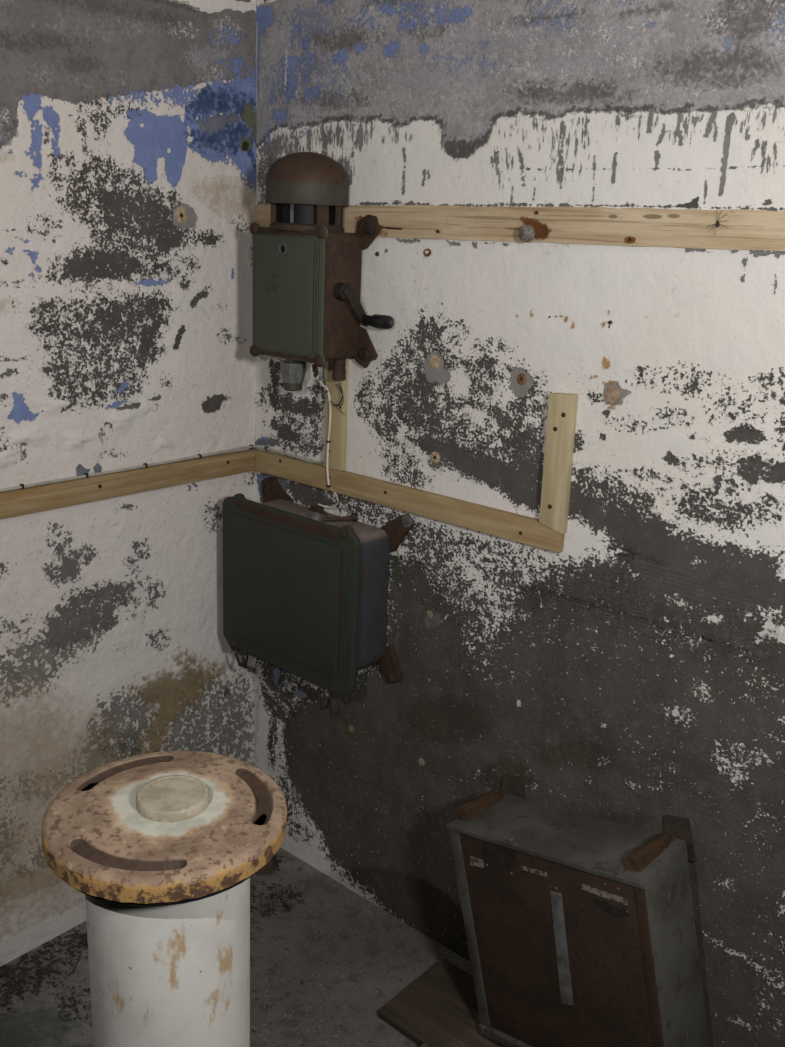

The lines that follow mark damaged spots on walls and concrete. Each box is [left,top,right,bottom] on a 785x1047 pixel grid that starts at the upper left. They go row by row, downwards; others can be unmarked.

water stain [511,149,536,204]
water stain [558,122,566,189]
water stain [647,109,683,171]
water stain [703,110,735,204]
spalling [0,0,785,476]
corrosion [520,212,549,240]
peeling [354,302,552,516]
water stain [138,654,225,754]
peeling [0,359,785,1047]